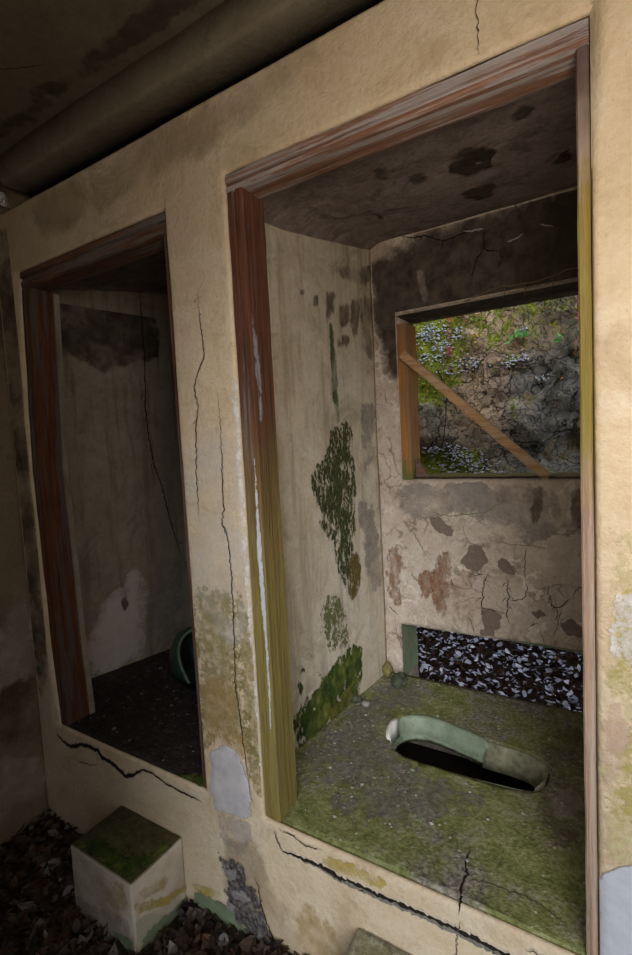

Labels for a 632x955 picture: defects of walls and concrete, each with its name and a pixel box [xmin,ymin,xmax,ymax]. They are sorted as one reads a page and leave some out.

leakage [449,148,496,176]
leakage [60,303,159,370]
crack [192,288,254,808]
leakage [358,502,382,591]
spalling [461,545,515,575]
crack [468,509,582,637]
spalling [480,608,502,637]
leakage [235,595,262,797]
crack [56,733,197,800]
spalling [113,852,275,953]
crack [273,831,566,955]
peeling [599,865,632,955]